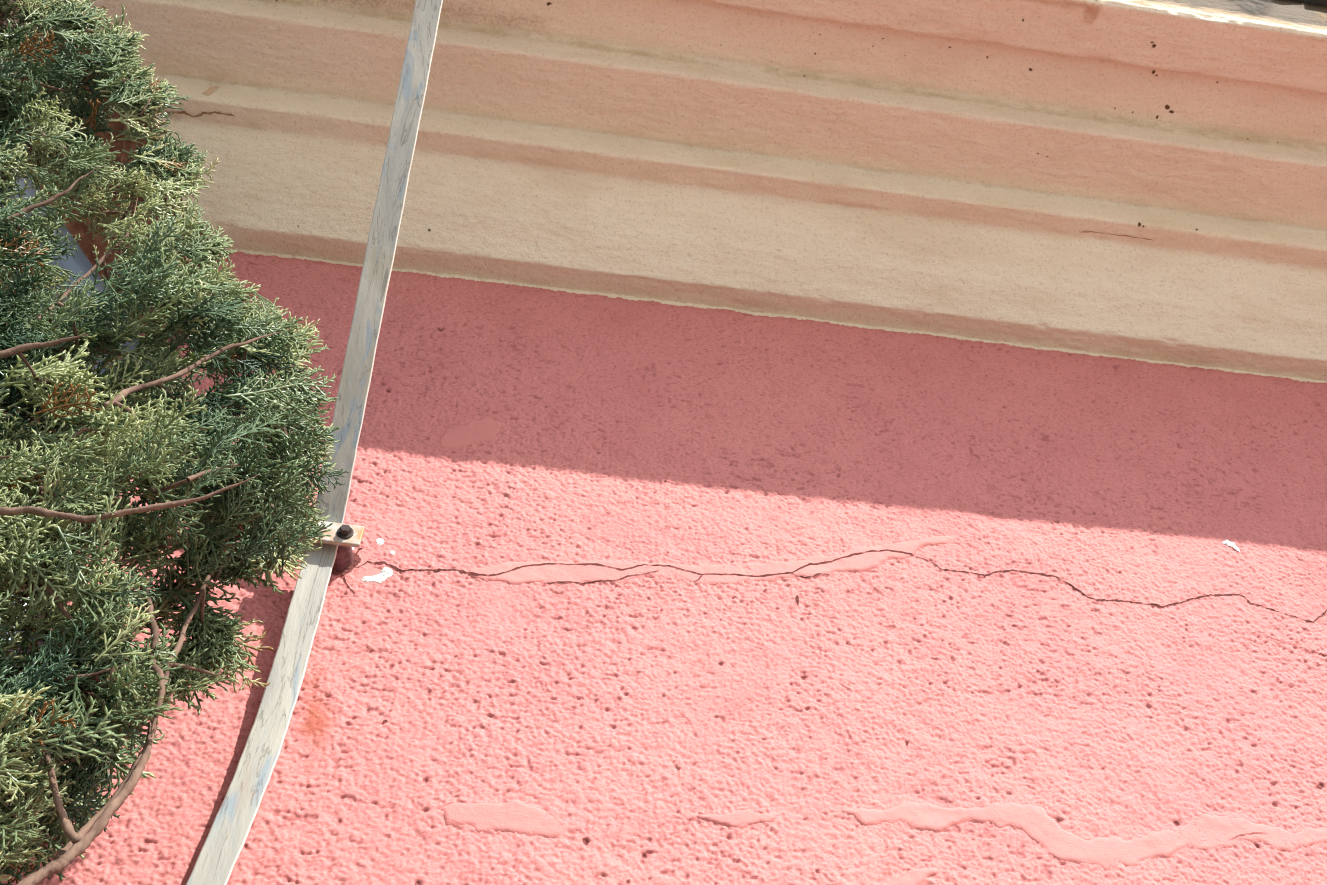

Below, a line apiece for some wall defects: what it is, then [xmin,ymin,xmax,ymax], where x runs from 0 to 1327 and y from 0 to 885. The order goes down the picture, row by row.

crack [343,548,1327,656]